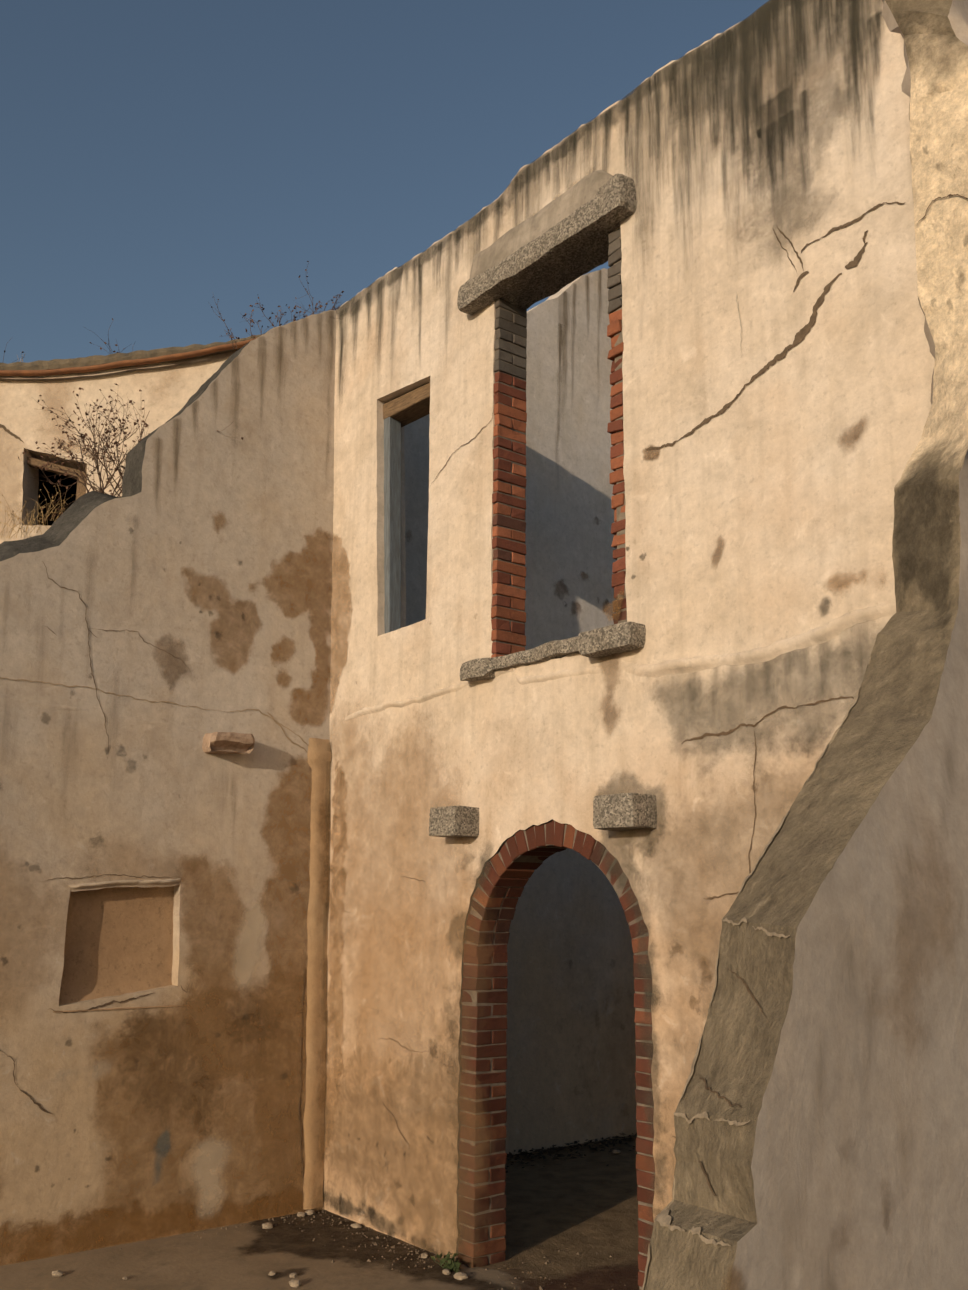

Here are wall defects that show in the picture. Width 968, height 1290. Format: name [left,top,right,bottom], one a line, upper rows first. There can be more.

damp [605,81,653,128]
damp [704,0,777,125]
damp [767,91,806,154]
damp [419,212,487,294]
crack [645,194,968,450]
crack [0,424,24,443]
crack [0,564,310,759]
damp [183,569,259,671]
damp [265,532,350,724]
crack [681,696,854,899]
damp [0,760,394,1266]
crack [1,1051,52,1114]